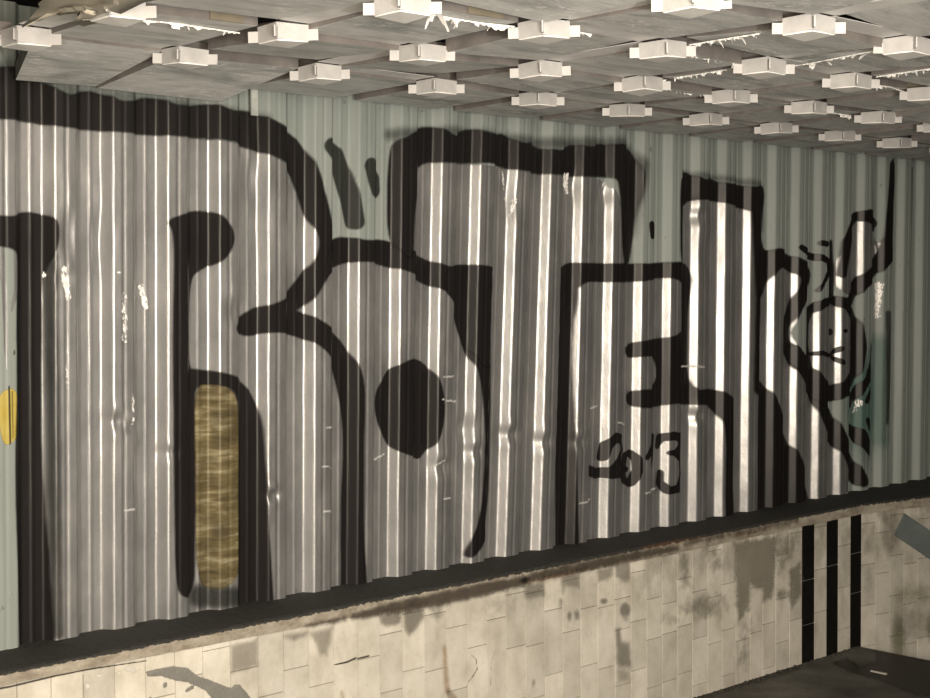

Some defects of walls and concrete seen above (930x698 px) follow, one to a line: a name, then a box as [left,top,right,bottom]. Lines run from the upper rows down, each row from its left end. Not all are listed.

water stain [736,538,801,618]
crack [336,655,369,665]